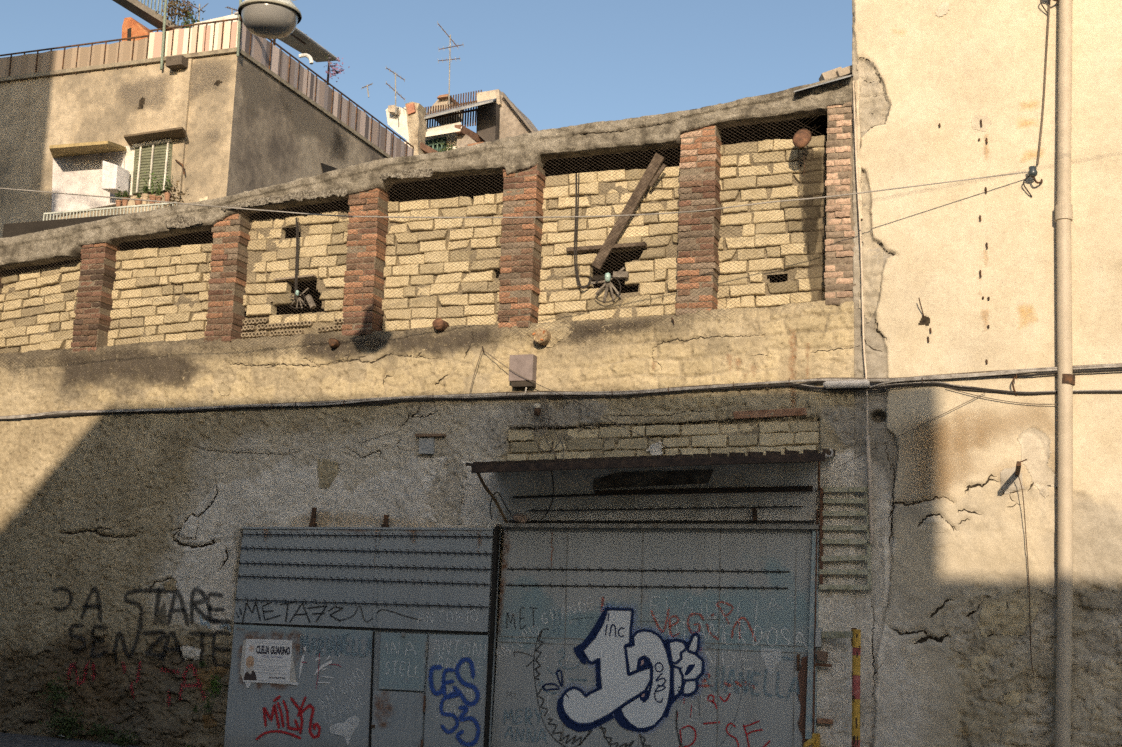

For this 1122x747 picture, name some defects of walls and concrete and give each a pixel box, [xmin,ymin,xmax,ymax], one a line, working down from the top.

spalling [857,60,892,132]
spalling [859,169,883,323]
spalling [317,457,339,488]
peeling [1000,428,1058,498]
crack [59,527,134,538]
crack [170,485,228,569]
spalling [977,599,1039,637]